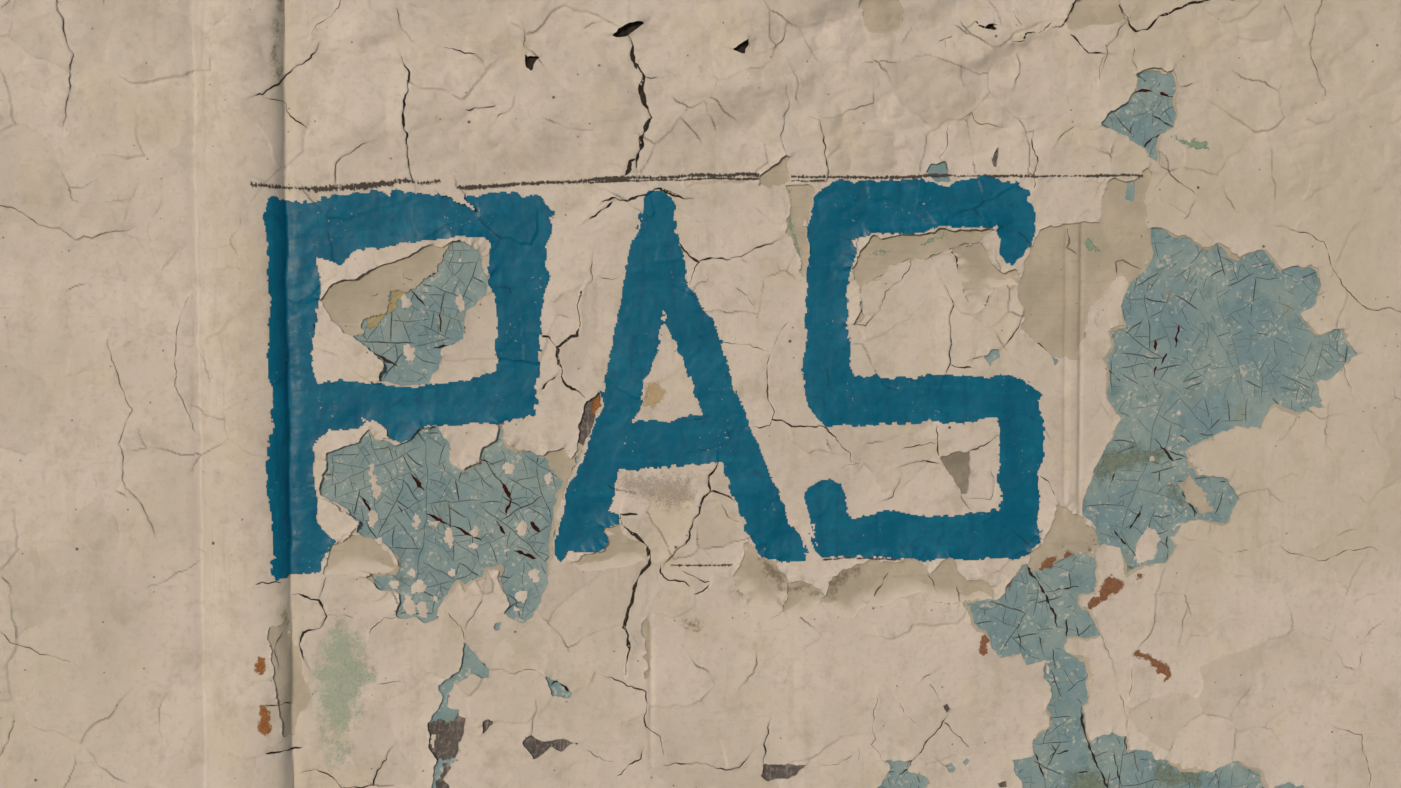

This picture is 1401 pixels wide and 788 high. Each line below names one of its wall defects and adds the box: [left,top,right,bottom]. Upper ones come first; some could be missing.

crack [590,35,693,219]
crack [939,0,1233,219]
peeling [318,236,492,388]
peeling [726,62,1364,788]
crack [363,459,540,559]
peeling [314,392,652,630]
corrosion [255,657,266,675]
corrosion [257,705,272,736]
peeling [427,643,489,788]
crack [496,462,770,787]
corrosion [1088,574,1143,609]
corrosion [1134,650,1171,682]